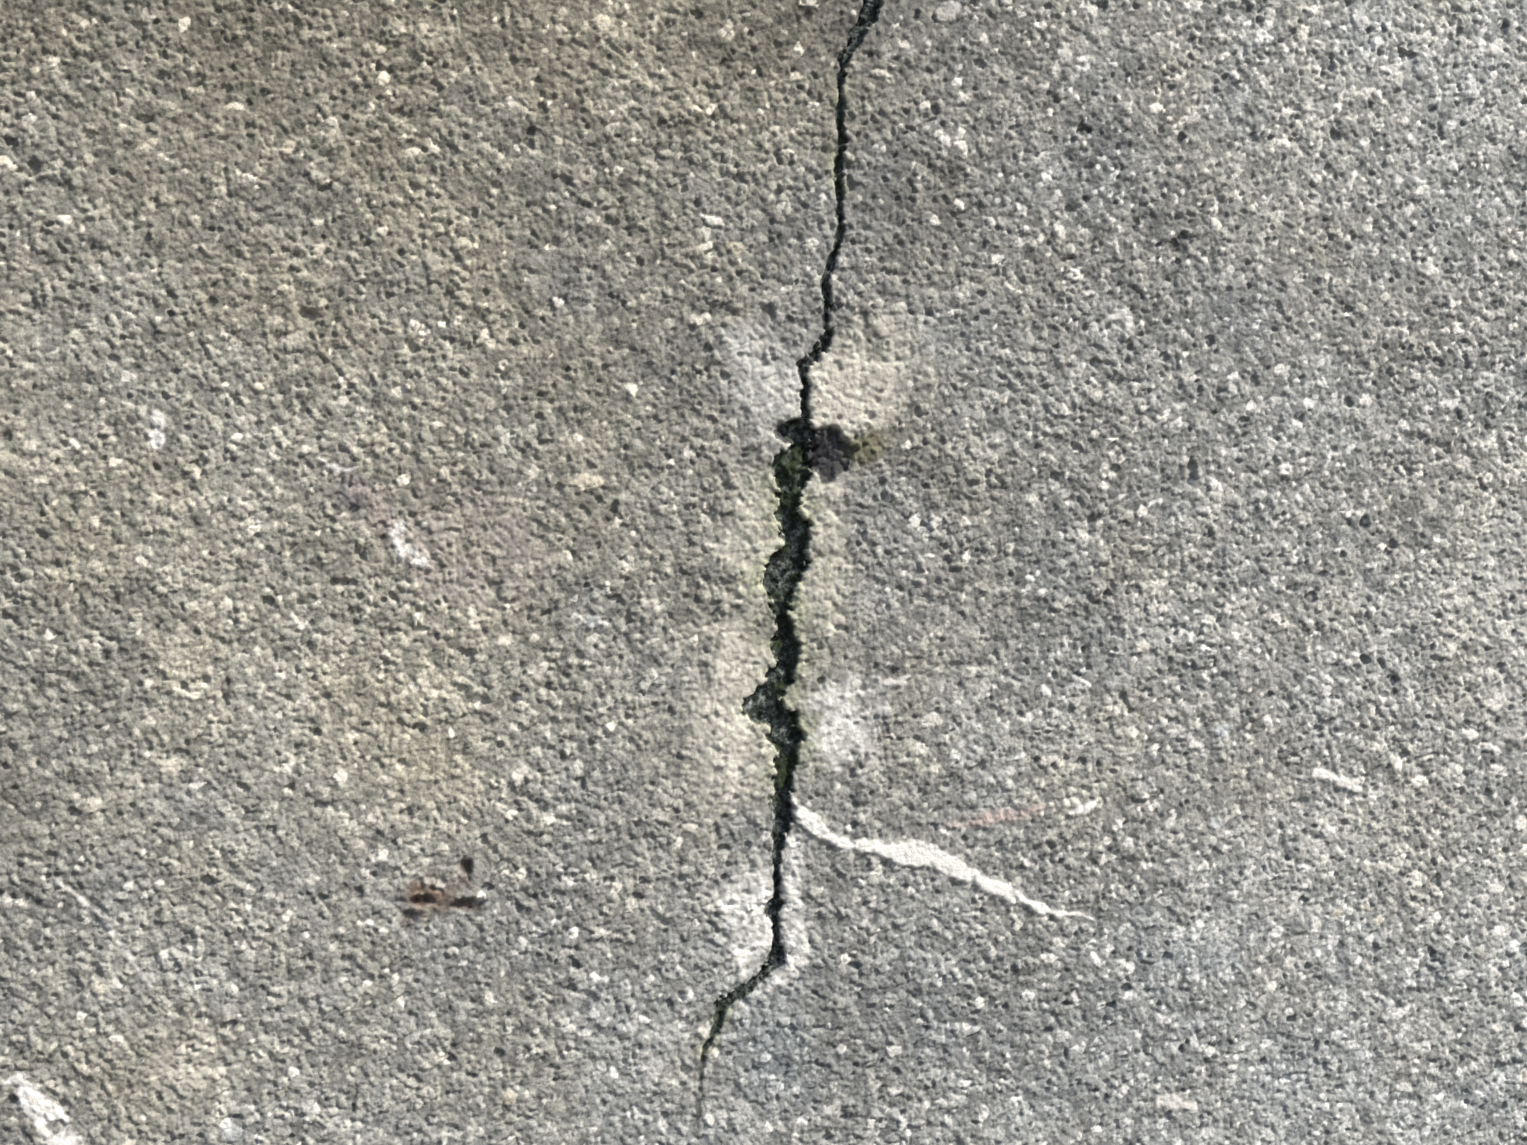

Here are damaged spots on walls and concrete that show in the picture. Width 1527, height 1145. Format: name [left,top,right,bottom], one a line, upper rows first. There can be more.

crack [700,0,880,1071]